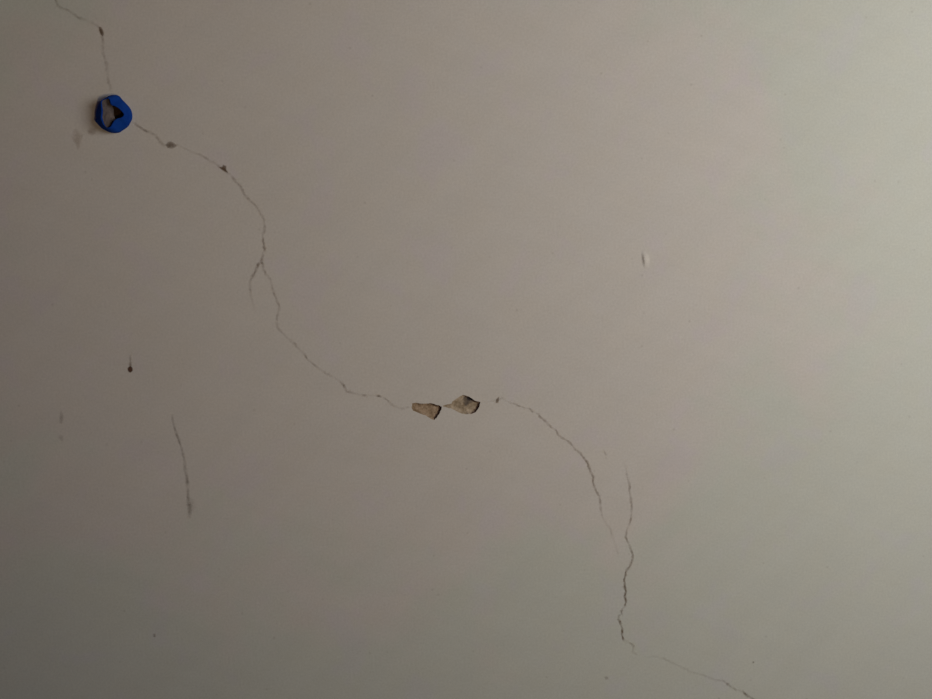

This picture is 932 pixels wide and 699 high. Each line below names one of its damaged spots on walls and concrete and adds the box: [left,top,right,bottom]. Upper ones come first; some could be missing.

spalling [412,395,480,420]